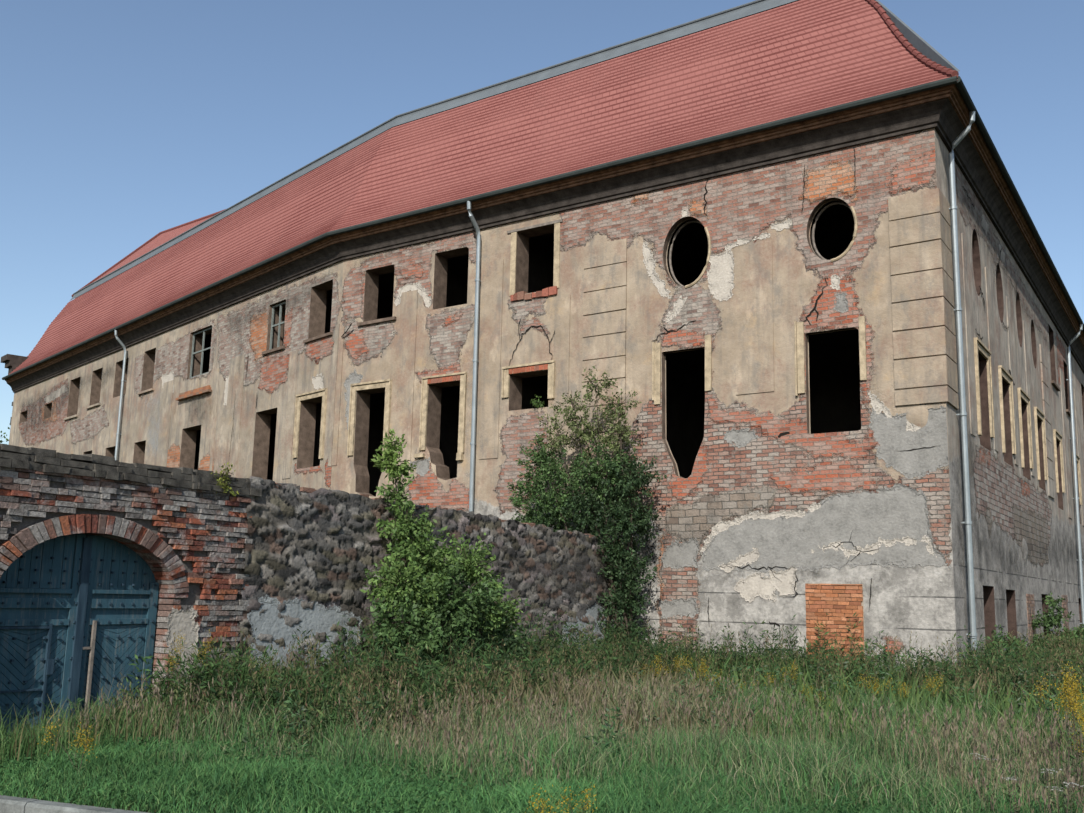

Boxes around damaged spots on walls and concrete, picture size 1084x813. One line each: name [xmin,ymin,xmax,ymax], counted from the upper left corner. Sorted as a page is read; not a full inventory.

spalling [134,231,477,430]
spalling [508,297,550,337]
crack [802,278,827,325]
spalling [559,129,952,657]
spalling [406,457,474,512]
spalling [973,438,1052,567]
peeling [247,594,363,677]